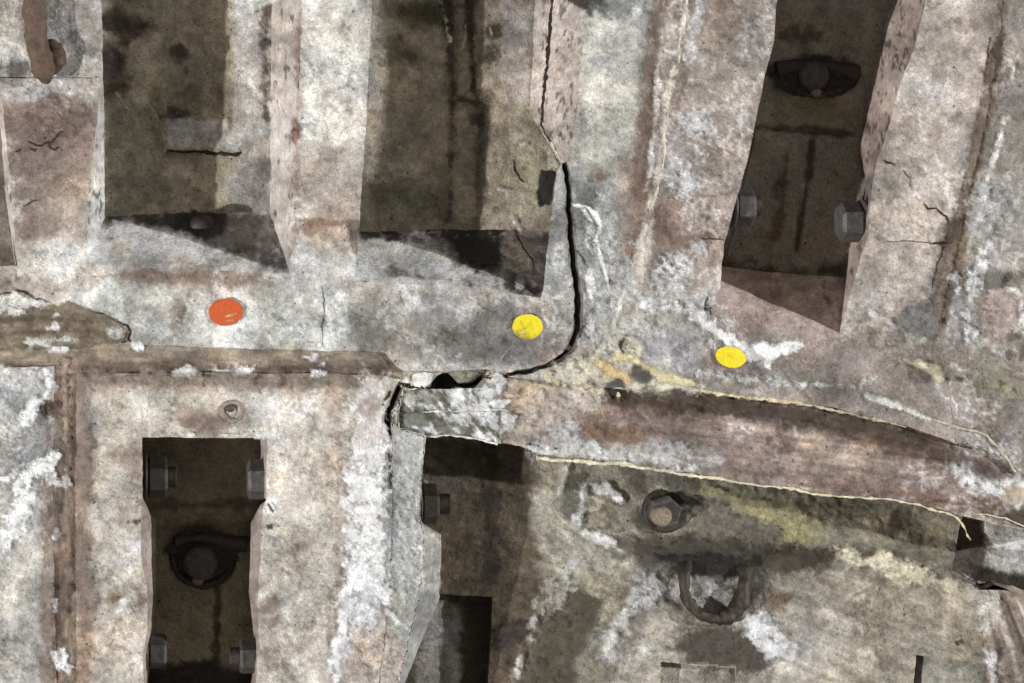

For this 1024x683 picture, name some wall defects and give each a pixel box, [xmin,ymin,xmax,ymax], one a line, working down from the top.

crack [167,149,241,157]
crack [472,0,610,379]
leakage [0,365,59,451]
crack [382,381,424,490]
spalling [399,370,517,445]
leakage [0,450,72,555]
leakage [50,648,73,673]